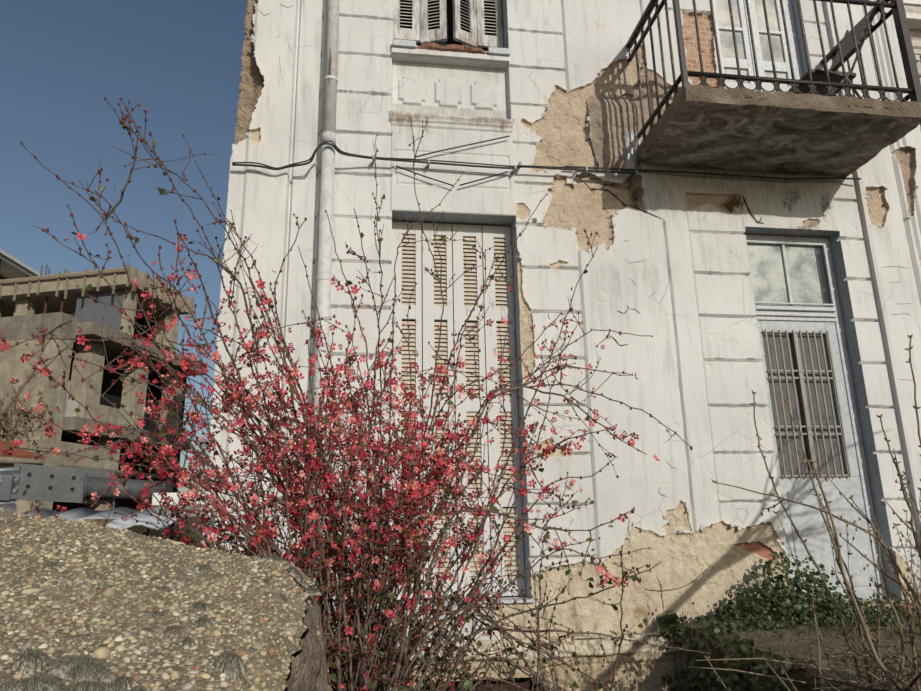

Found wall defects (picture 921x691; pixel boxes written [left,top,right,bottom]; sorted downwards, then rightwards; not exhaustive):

flaking render [235,0,264,146]
flaking render [682,12,720,87]
peeling [516,203,531,220]
flaking render [521,44,644,252]
flaking render [685,192,741,212]
flaking render [865,185,890,228]
flaking render [892,146,919,219]
flaking render [517,248,535,383]
flaking render [495,500,791,639]